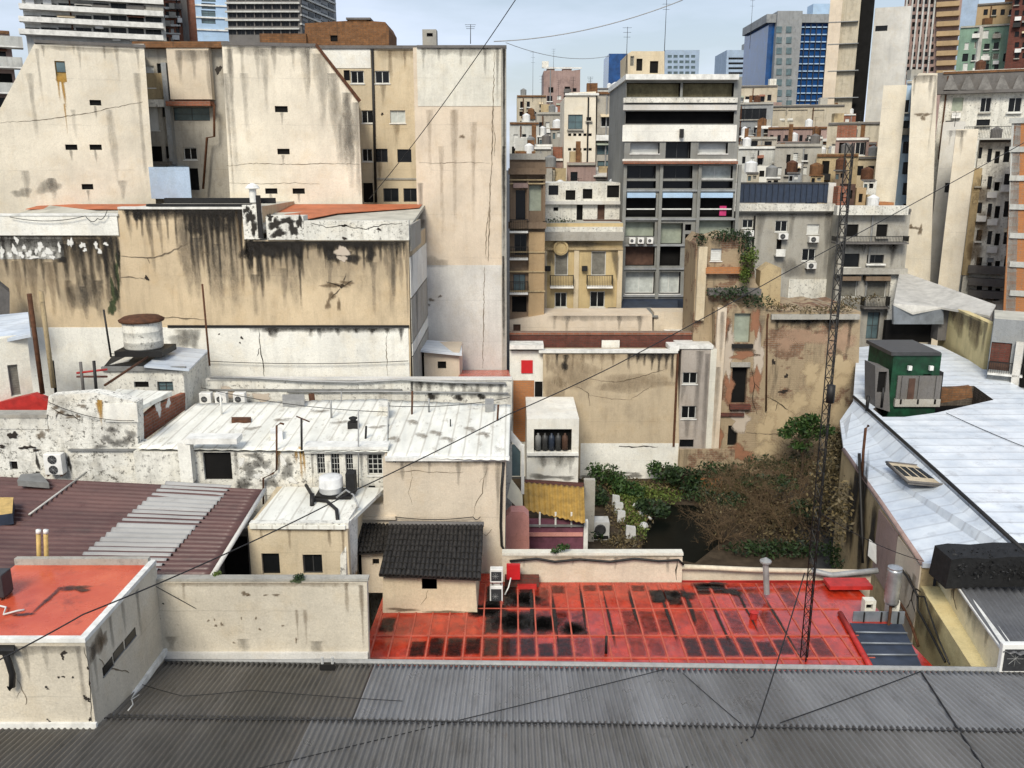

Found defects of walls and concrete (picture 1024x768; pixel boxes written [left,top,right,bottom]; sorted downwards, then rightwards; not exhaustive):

corrosion [57,76,67,123]
crack [423,53,495,358]
peeling [0,236,108,260]
damp [125,206,405,289]
spalling [334,237,350,262]
spalling [723,309,764,404]
spalling [777,327,854,415]
spalling [0,429,48,452]
damp [845,459,876,569]
damp [13,586,88,616]
damp [379,608,411,631]
damp [410,582,799,656]